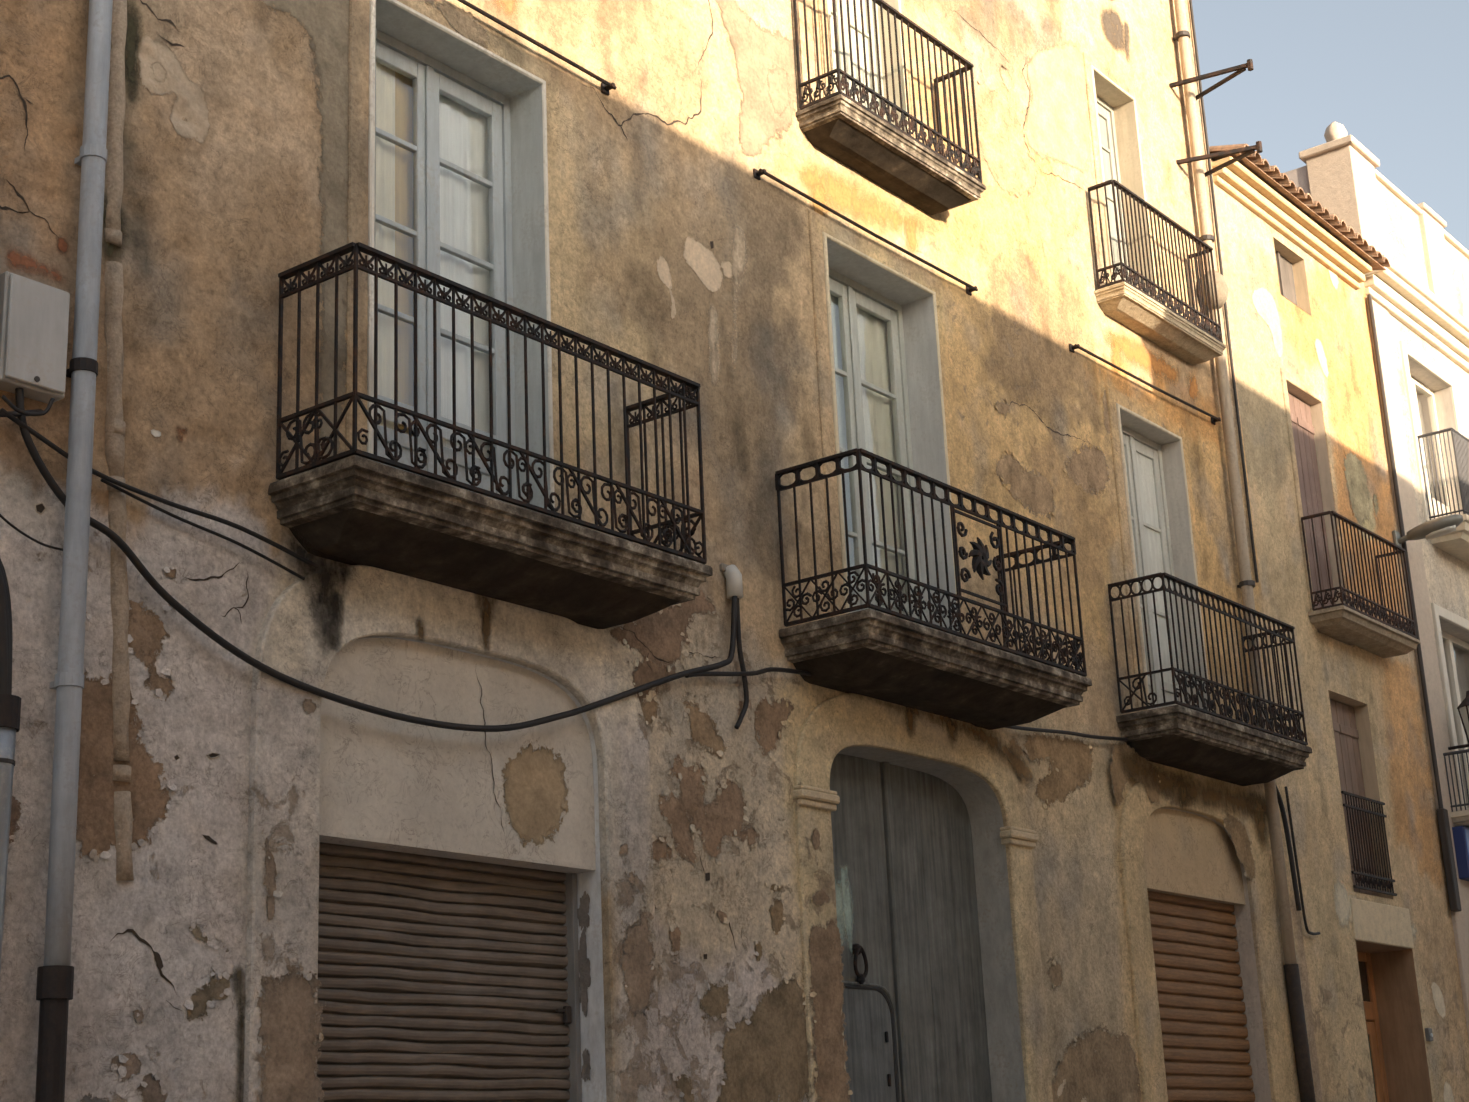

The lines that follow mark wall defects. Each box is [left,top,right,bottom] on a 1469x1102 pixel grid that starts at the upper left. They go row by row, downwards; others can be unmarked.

crack [0,75,34,149]
crack [582,0,713,139]
crack [0,182,59,238]
peeling [76,567,180,862]
crack [184,564,249,623]
leakage [288,536,351,649]
peeling [610,586,720,727]
peeling [652,698,759,868]
peeling [1008,732,1193,810]
crack [113,929,182,1011]
peeling [253,964,326,1102]
peeling [698,882,853,1102]